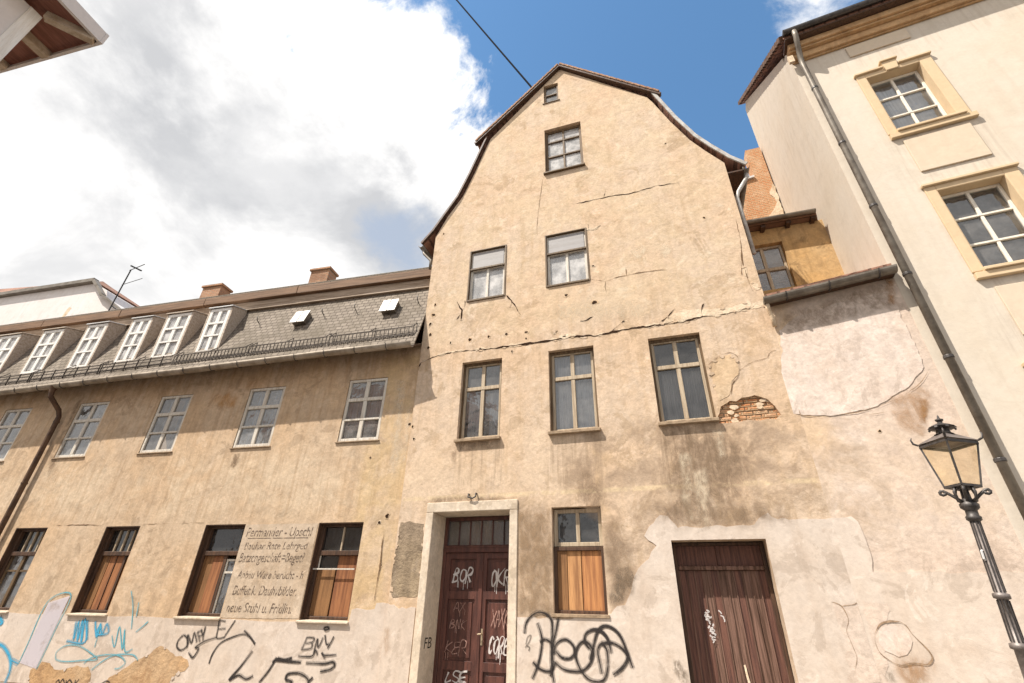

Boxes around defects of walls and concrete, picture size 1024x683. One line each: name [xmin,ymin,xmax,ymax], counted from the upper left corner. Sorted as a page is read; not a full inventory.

crack [575,182,679,232]
crack [419,221,754,366]
crack [709,350,775,396]
spalling [708,354,780,423]
spalling [378,521,424,597]
flaking render [27,662,92,683]
flaking render [106,646,189,683]